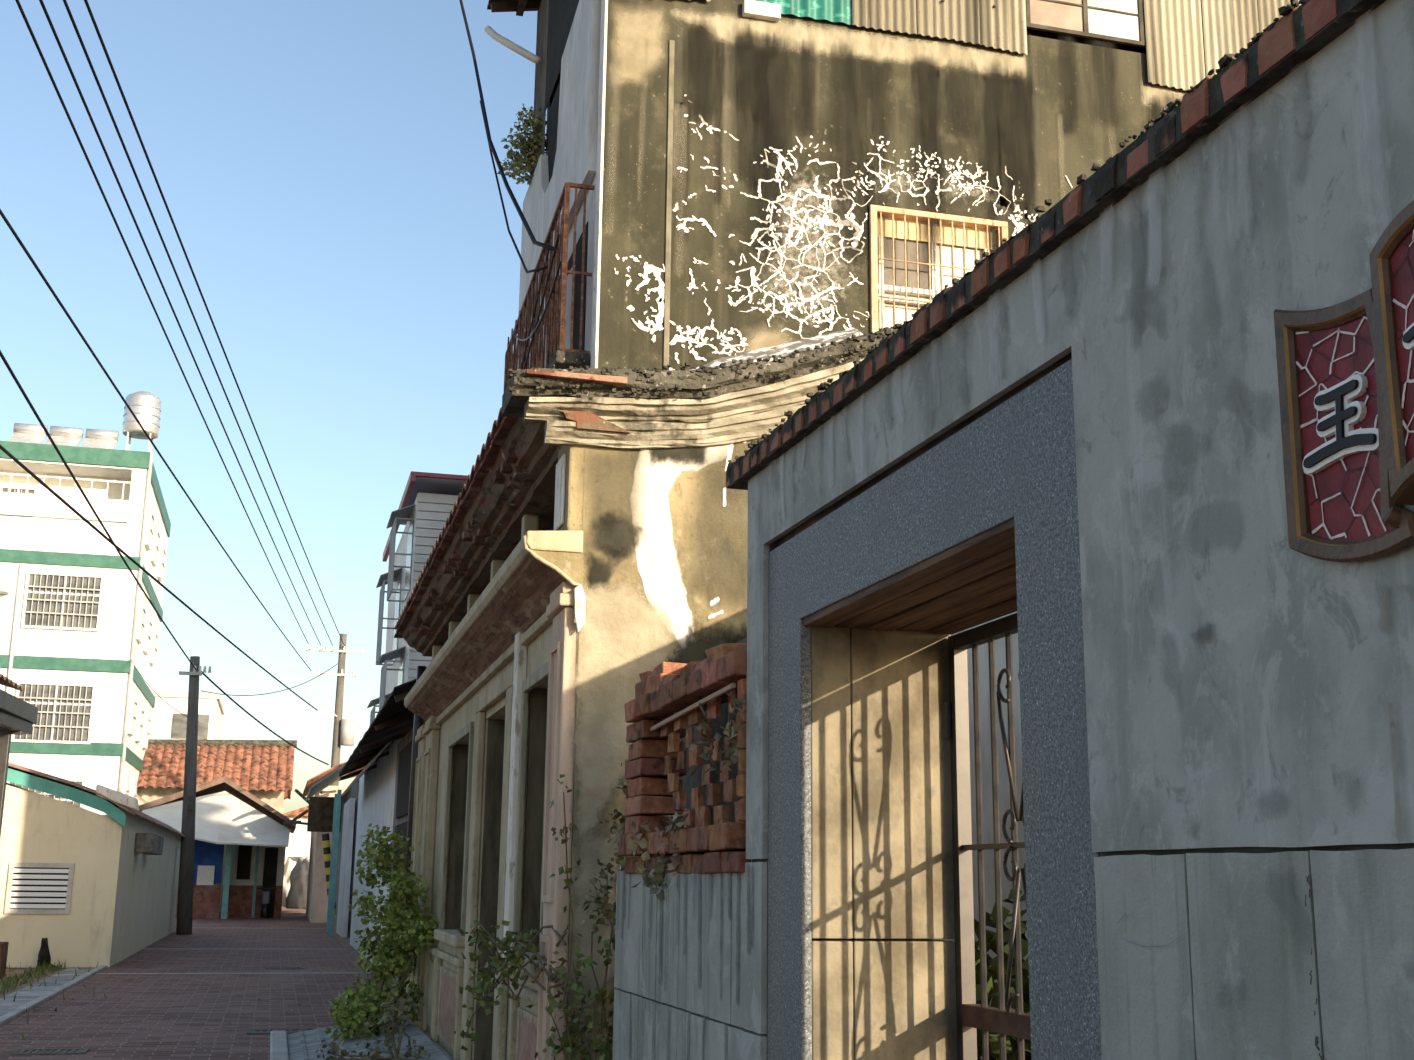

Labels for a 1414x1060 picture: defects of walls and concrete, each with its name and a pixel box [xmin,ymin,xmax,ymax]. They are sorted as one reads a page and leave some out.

crack [614,94,1037,370]
damp [675,11,1033,261]
damp [1142,84,1186,124]